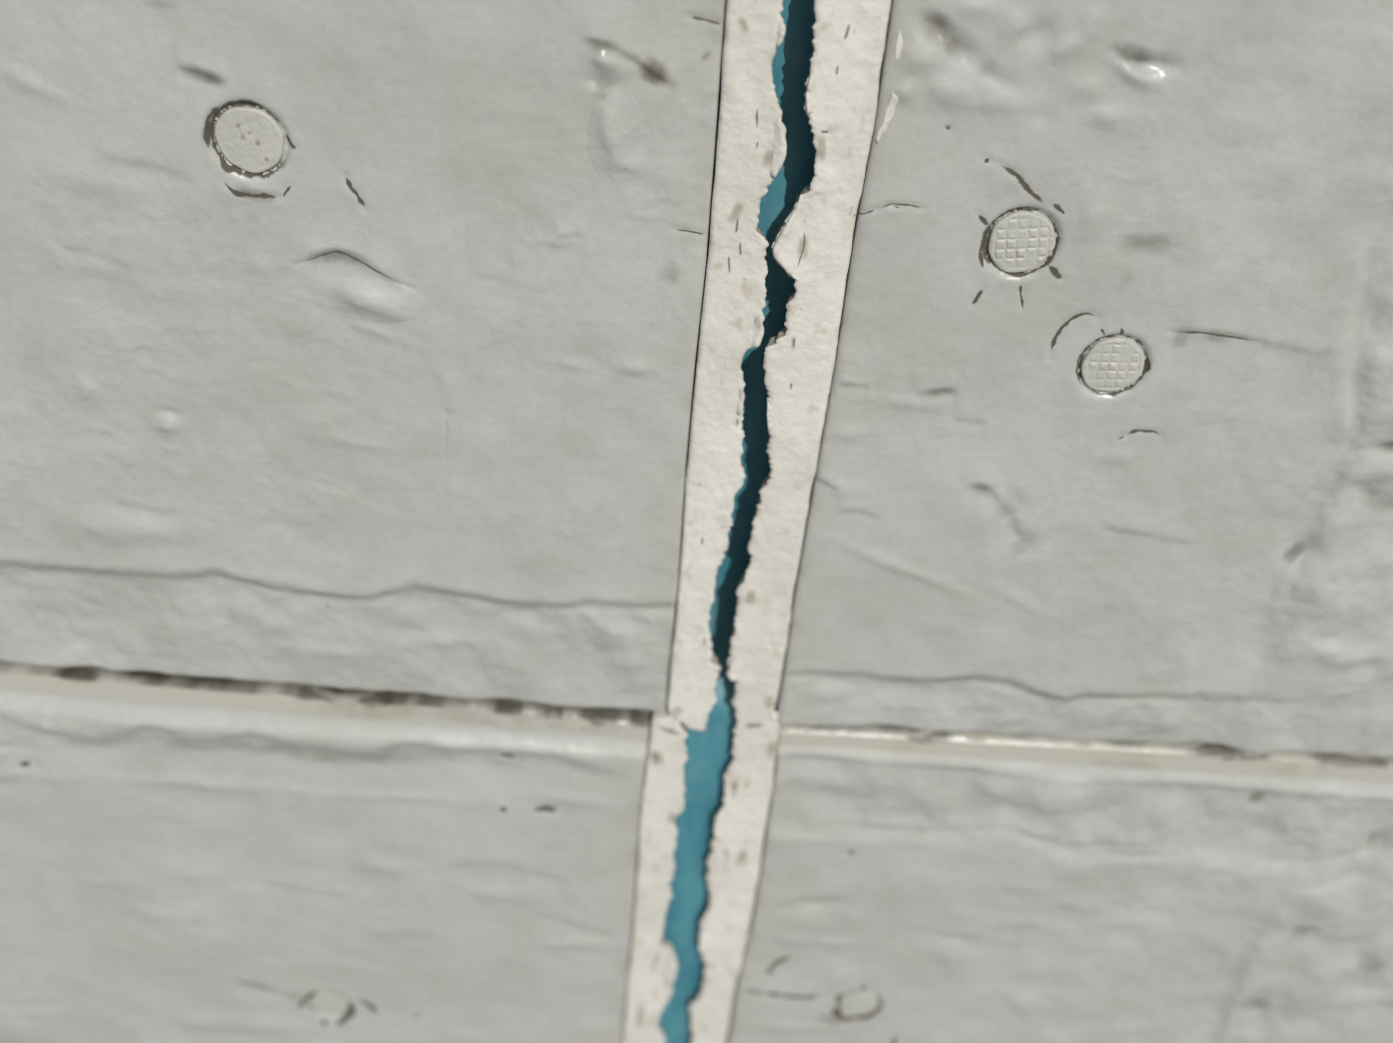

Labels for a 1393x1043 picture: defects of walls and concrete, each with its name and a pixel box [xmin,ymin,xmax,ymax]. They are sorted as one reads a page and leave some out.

crack [652,15,897,1043]